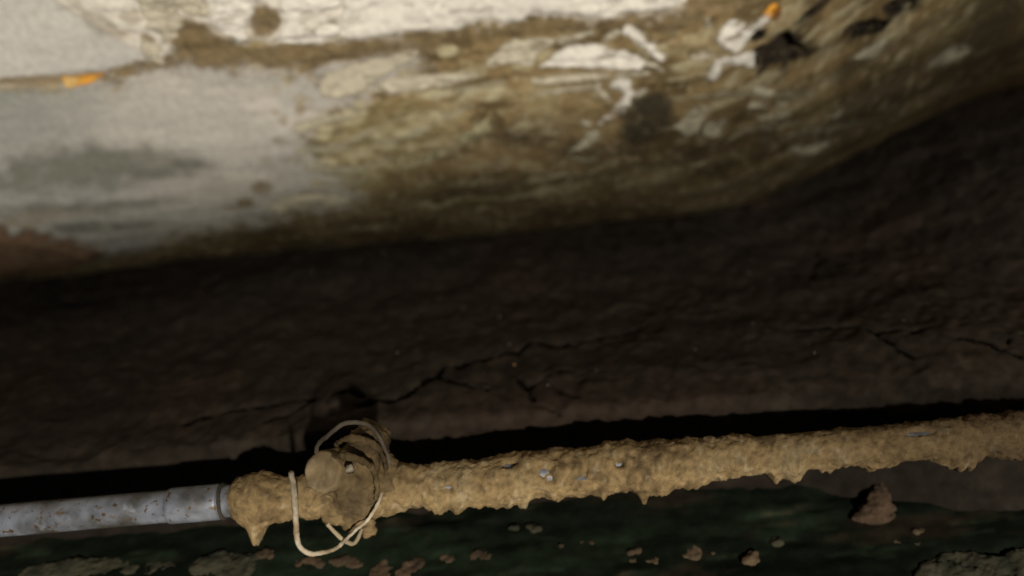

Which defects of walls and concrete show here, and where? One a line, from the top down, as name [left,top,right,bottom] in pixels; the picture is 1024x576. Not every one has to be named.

peeling [274,0,676,44]
peeling [318,25,665,162]
peeling [672,0,864,155]
spalling [844,0,916,60]
peeling [929,47,970,66]
damp [0,148,204,188]
peeling [267,193,351,214]
crack [184,329,642,426]